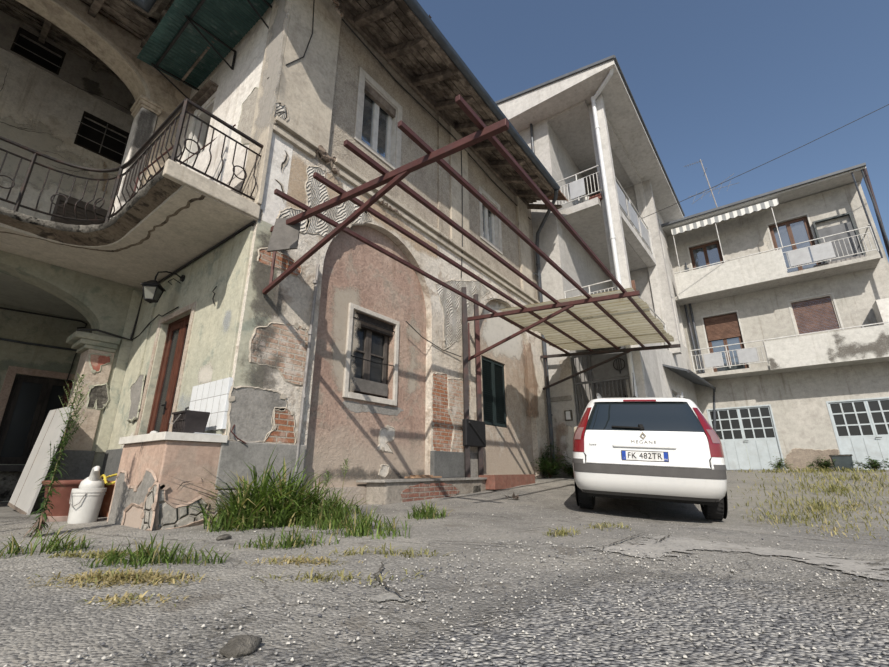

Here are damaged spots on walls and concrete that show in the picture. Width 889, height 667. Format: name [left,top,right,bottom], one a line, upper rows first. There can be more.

spalling [0,177,205,252]
peeling [276,165,371,238]
spalling [86,353,112,410]
spalling [127,373,146,422]
flaking render [248,322,310,387]
flaking render [263,393,297,445]
peeling [376,425,395,454]
flaking render [431,372,471,452]
spalling [107,468,170,525]
peeling [378,464,390,478]